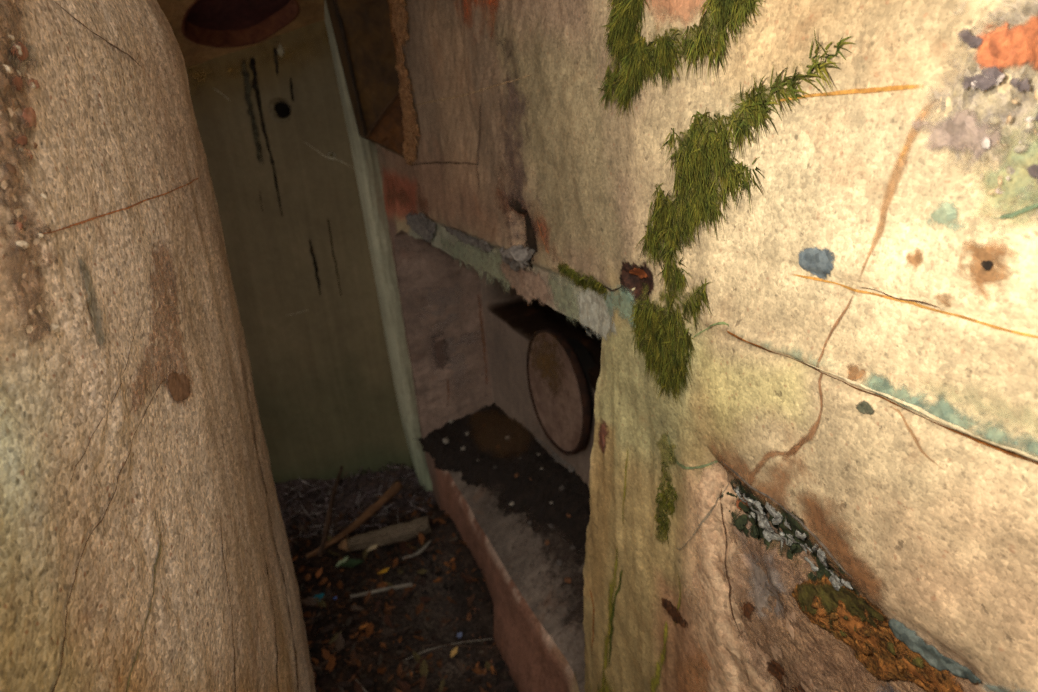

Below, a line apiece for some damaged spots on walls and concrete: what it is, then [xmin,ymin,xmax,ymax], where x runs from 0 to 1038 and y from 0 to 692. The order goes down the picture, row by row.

corrosion [961,243,1007,299]
crack [793,274,1038,338]
spalling [731,486,918,692]